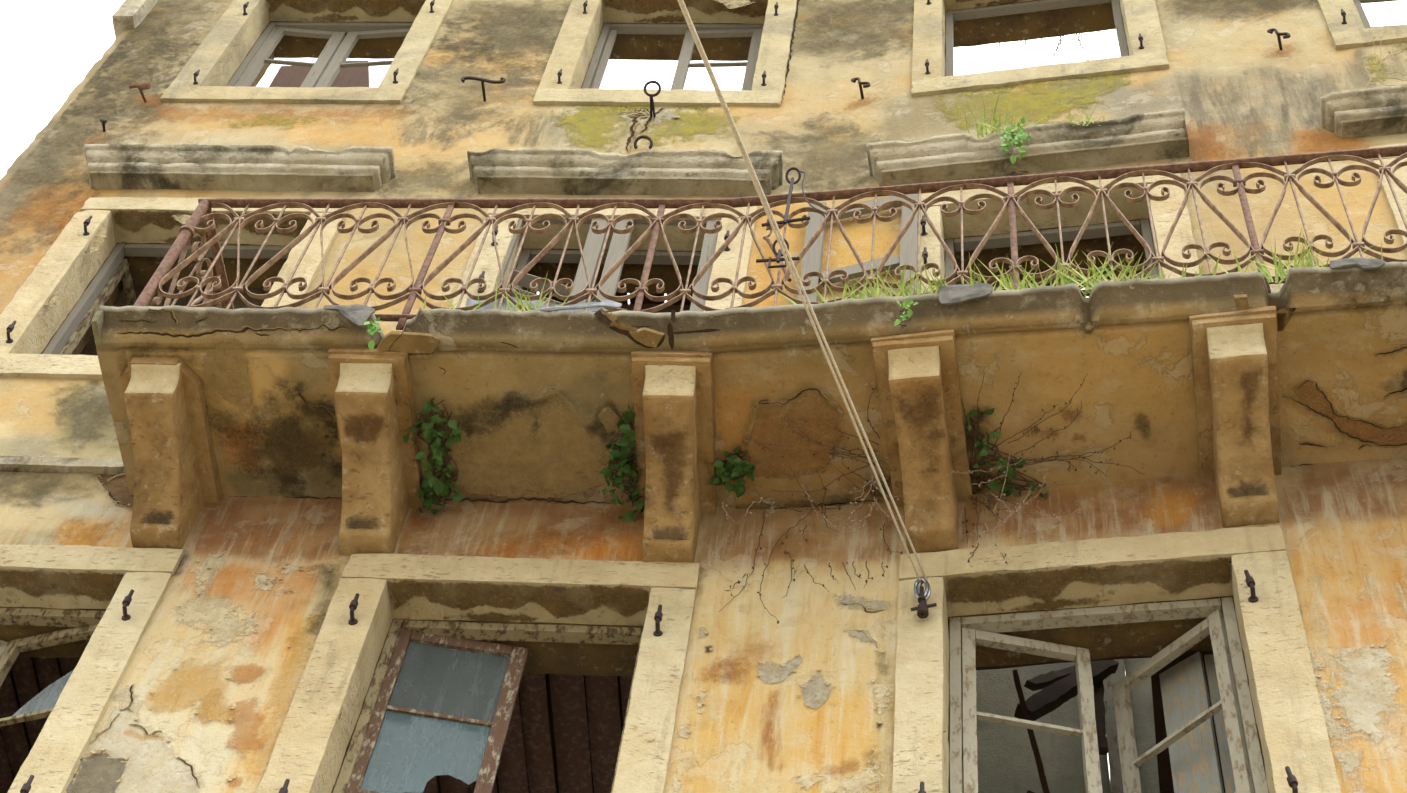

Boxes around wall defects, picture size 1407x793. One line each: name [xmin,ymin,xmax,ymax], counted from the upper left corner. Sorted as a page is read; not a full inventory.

damp [103,1,200,67]
crack [1374,346,1407,356]
damp [248,398,342,497]
crack [755,388,839,414]
crack [1282,380,1407,467]
peeling [172,551,258,647]
peeling [226,664,266,684]
peeling [756,654,836,709]
flaking render [64,668,263,793]
peeling [1309,645,1400,793]
peeling [836,749,882,793]